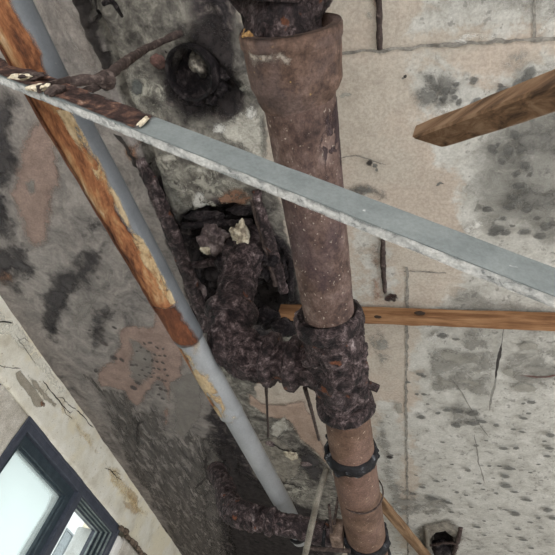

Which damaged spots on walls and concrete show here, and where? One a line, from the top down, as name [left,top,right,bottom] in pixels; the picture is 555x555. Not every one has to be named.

damp [417,74,462,115]
damp [496,66,536,93]
damp [214,107,264,157]
damp [488,124,555,213]
spalling [0,71,555,337]
damp [488,216,555,239]
damp [0,245,34,294]
damp [42,250,101,334]
damp [90,310,111,347]
peeling [94,314,201,438]
crack [489,329,504,410]
crack [43,381,94,428]